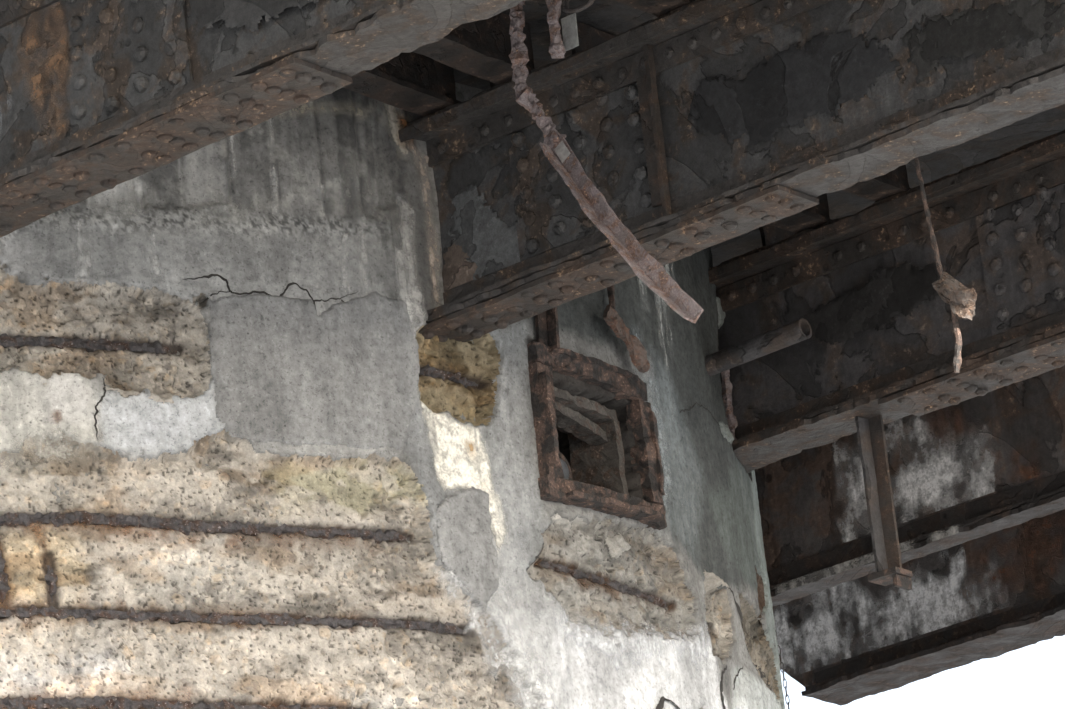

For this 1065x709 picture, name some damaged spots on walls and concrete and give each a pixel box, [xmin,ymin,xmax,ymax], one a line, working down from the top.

corrosion [25,4,66,106]
spalling [0,261,212,404]
crack [183,274,358,308]
damp [397,197,423,331]
spalling [415,326,501,427]
corrosion [721,370,738,441]
damp [897,448,960,511]
spalling [0,430,538,709]
spalling [526,513,780,699]
crack [656,696,680,709]
crack [720,587,770,709]
damp [775,555,978,671]